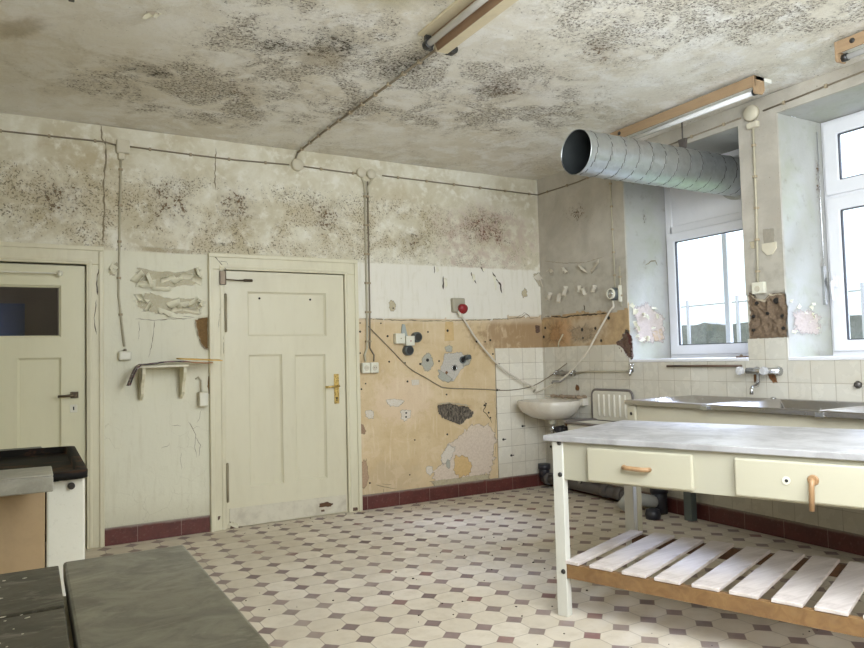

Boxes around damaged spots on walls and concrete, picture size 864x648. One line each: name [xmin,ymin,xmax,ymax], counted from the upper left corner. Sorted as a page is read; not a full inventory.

damp [259,27,370,60]
damp [44,183,82,214]
crack [100,126,108,247]
damp [148,181,193,223]
damp [220,189,254,228]
damp [312,200,340,231]
peeling [130,267,208,350]
flaking render [419,322,466,371]
peeling [616,303,665,360]
flaking render [748,292,821,339]
peeling [426,394,497,486]
flaking render [362,459,371,488]